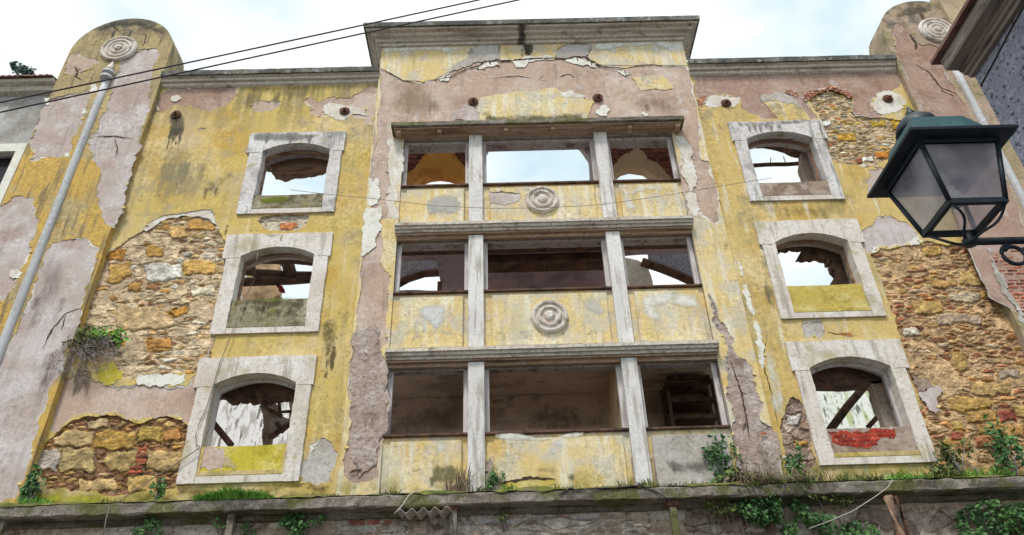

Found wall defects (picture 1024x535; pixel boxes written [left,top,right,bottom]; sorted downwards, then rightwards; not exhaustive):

peeling [30,91,90,161]
peeling [64,53,100,76]
peeling [88,48,238,228]
crack [909,35,954,96]
spalling [0,196,226,502]
water stain [323,322,335,377]
peeling [303,23,972,483]
spalling [861,156,1024,471]